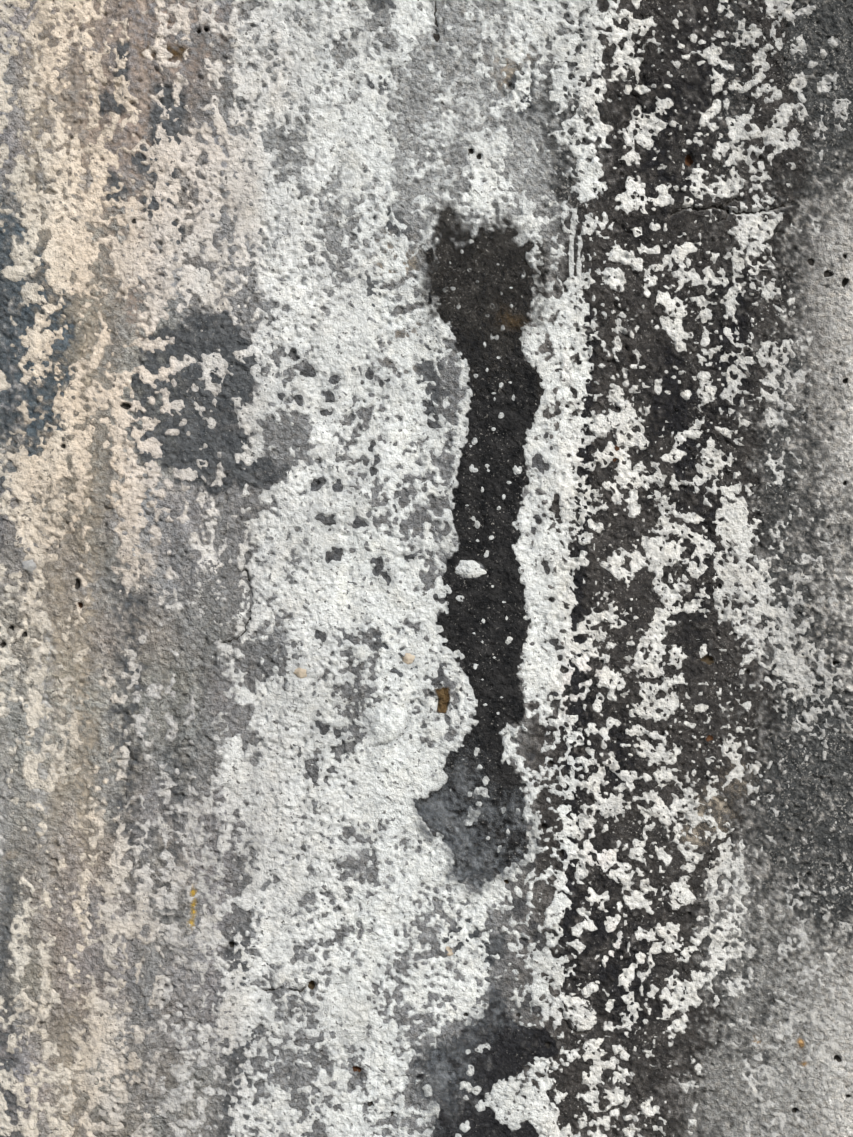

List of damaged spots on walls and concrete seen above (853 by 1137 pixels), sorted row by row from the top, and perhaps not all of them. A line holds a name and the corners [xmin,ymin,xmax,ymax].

peeling [717,0,737,19]
peeling [807,36,841,68]
peeling [817,72,839,93]
peeling [813,98,852,144]
crack [671,197,792,222]
peeling [625,220,667,237]
peeling [471,516,494,558]
peeling [694,704,712,729]
peeling [464,747,490,826]
peeling [709,849,853,1137]
peeling [665,1056,703,1093]
peeling [455,1120,471,1137]